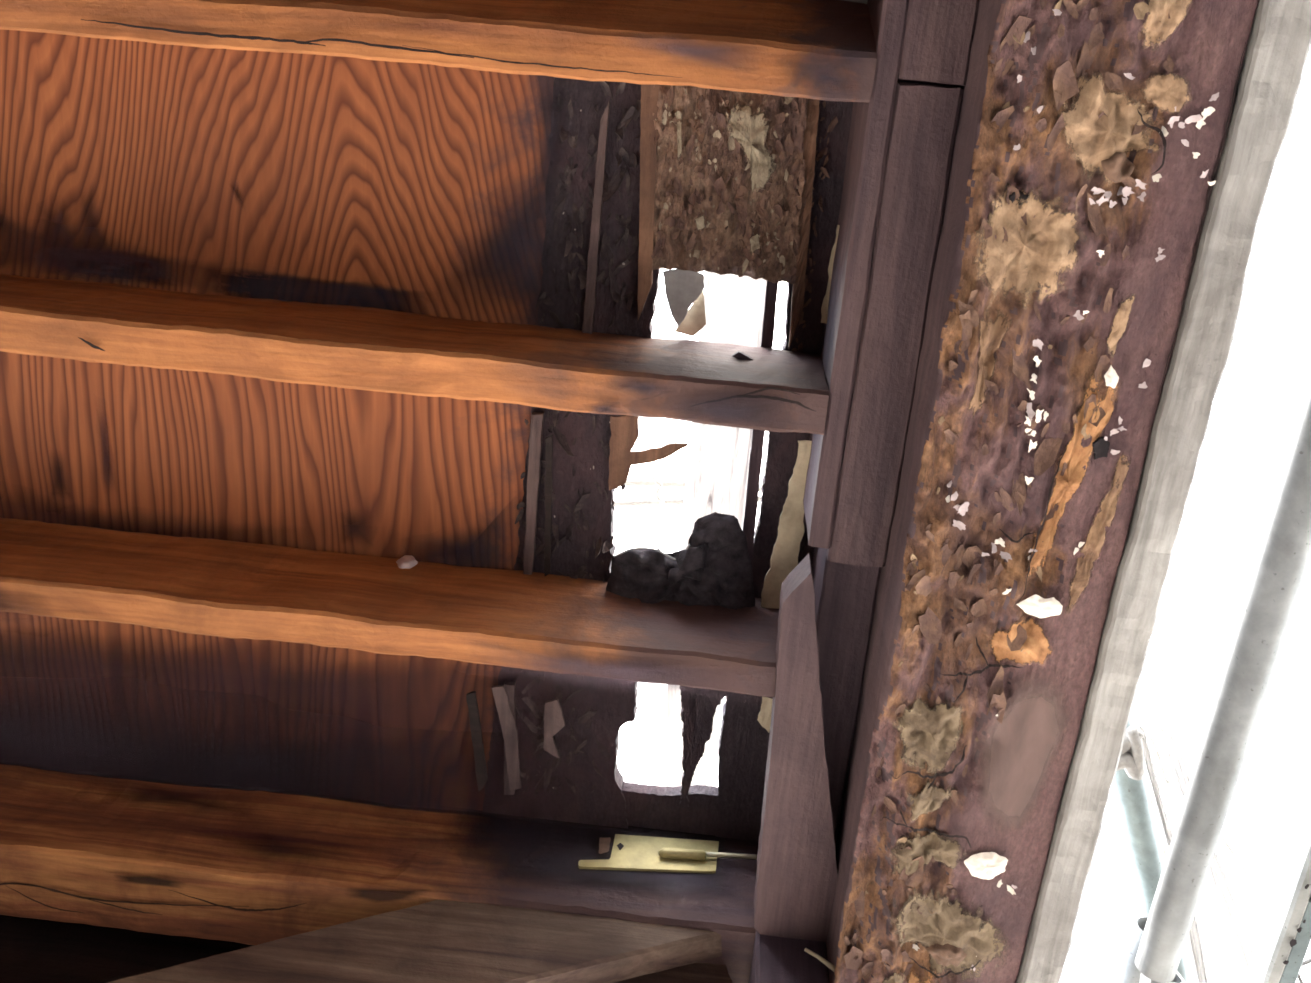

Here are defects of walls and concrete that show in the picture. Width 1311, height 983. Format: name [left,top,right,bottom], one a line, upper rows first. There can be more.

crack [81,19,682,78]
peeling [905,0,1219,724]
crack [0,882,305,915]
peeling [843,683,1017,983]